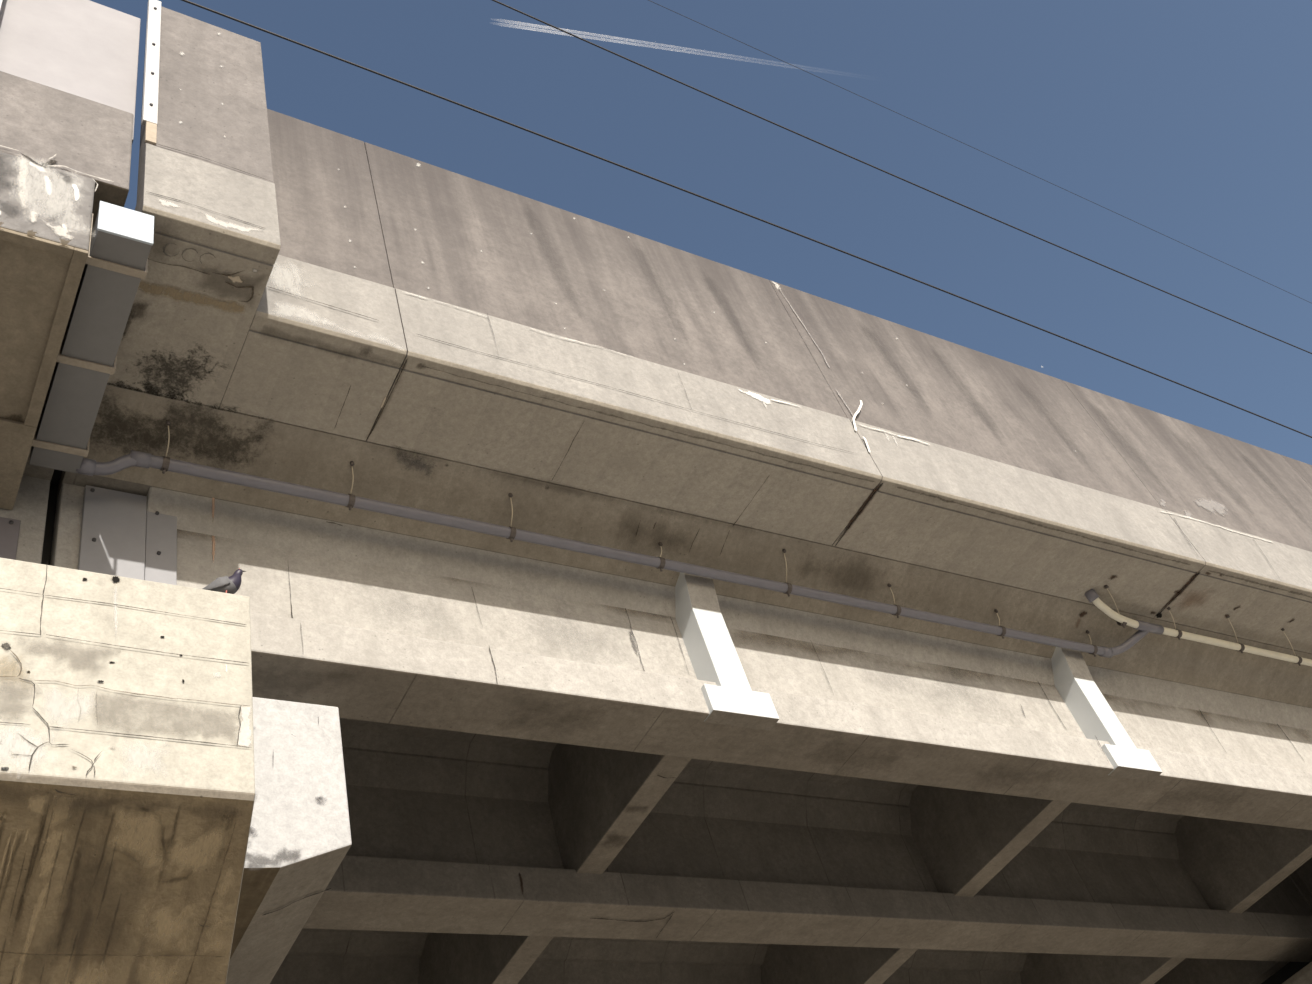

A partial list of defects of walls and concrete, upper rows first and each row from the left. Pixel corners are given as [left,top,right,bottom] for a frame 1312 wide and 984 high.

spalling [29,155,57,172]
leakage [95,347,262,462]
crack [39,570,47,634]
crack [0,650,248,795]
leakage [0,796,85,984]
leakage [114,811,222,870]